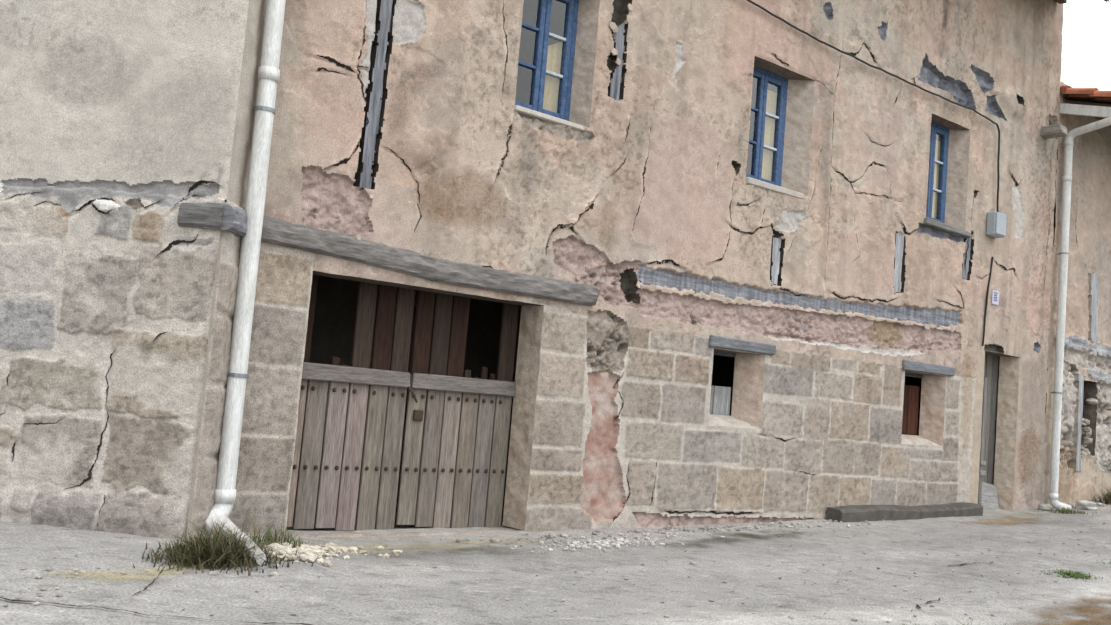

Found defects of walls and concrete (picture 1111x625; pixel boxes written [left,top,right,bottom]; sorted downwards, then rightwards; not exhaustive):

crack [6,192,116,214]
crack [144,180,222,209]
spalling [300,165,375,240]
peeling [361,0,377,103]
crack [317,0,422,232]
peeling [393,0,427,46]
crack [546,201,594,249]
crack [812,24,919,303]
spalling [911,53,1008,122]
crack [66,350,115,531]
spalling [553,235,965,528]
spalling [1060,344,1111,484]